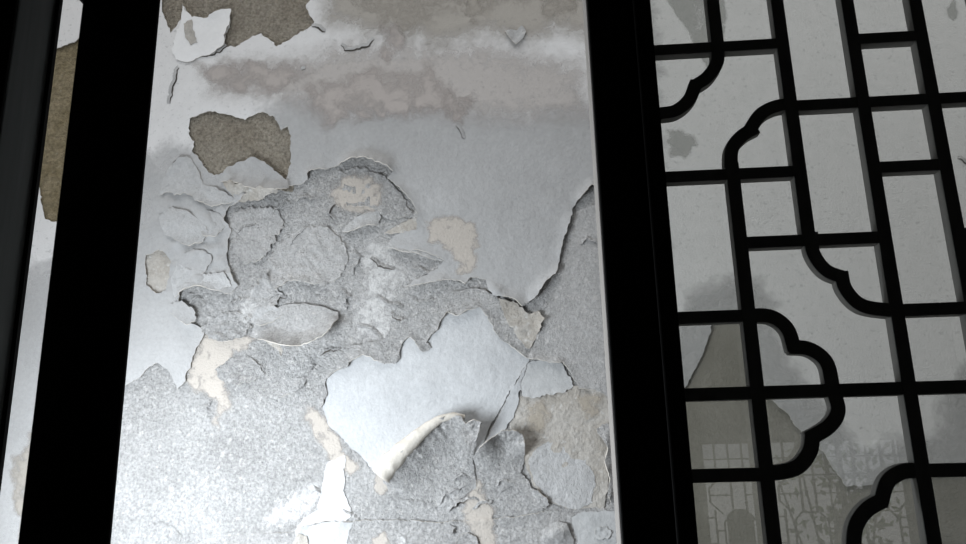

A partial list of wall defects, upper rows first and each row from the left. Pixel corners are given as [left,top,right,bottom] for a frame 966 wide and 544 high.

spalling [162,0,314,62]
leakage [204,0,584,124]
spalling [39,38,79,222]
peeling [125,98,617,544]
peeling [687,279,738,311]
peeling [752,284,773,309]
peeling [757,324,806,386]
peeling [0,261,52,544]
peeling [926,394,966,463]